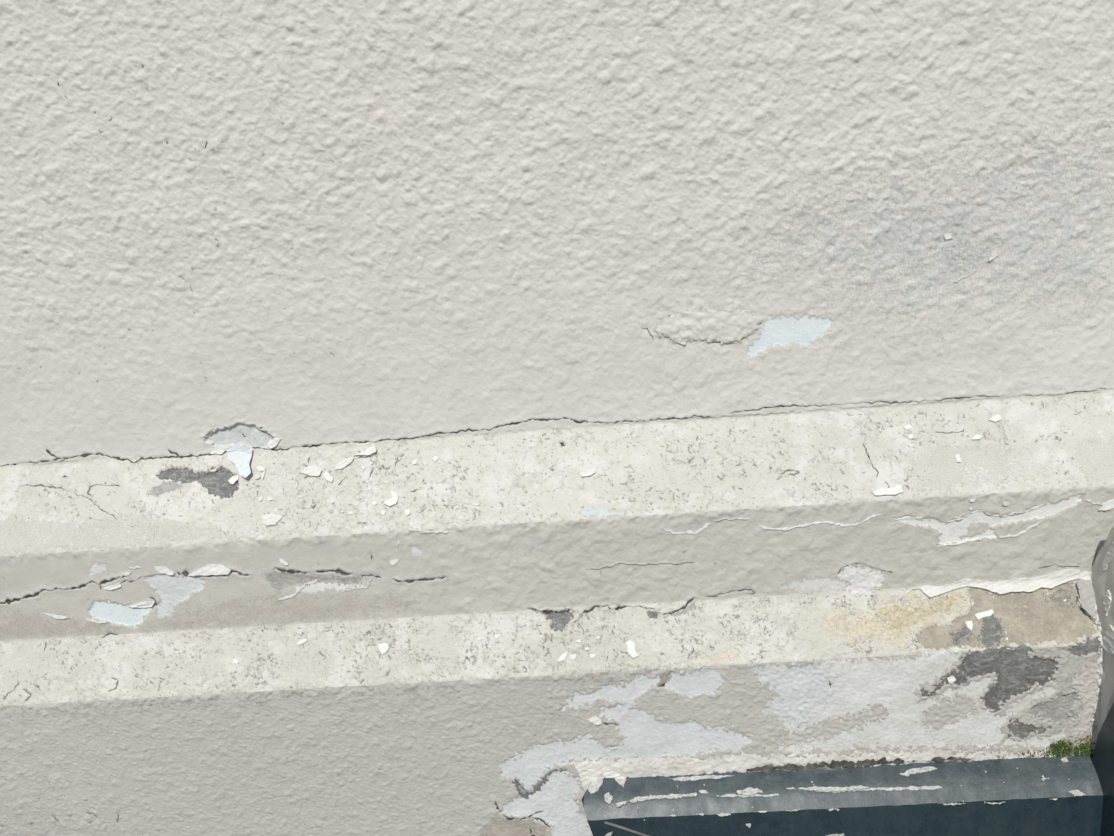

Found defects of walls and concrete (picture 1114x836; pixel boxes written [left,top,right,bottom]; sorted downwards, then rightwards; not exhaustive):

peeling [746,314,832,357]
crack [3,449,212,520]
flaking render [148,423,280,499]
peeling [296,443,450,565]
crack [252,388,1105,498]
peeling [762,494,1114,546]
peeling [87,563,231,627]
peeling [262,558,372,601]
flaking render [534,610,579,632]
crack [529,589,755,615]
peeling [753,541,1114,754]
peeling [479,666,753,836]